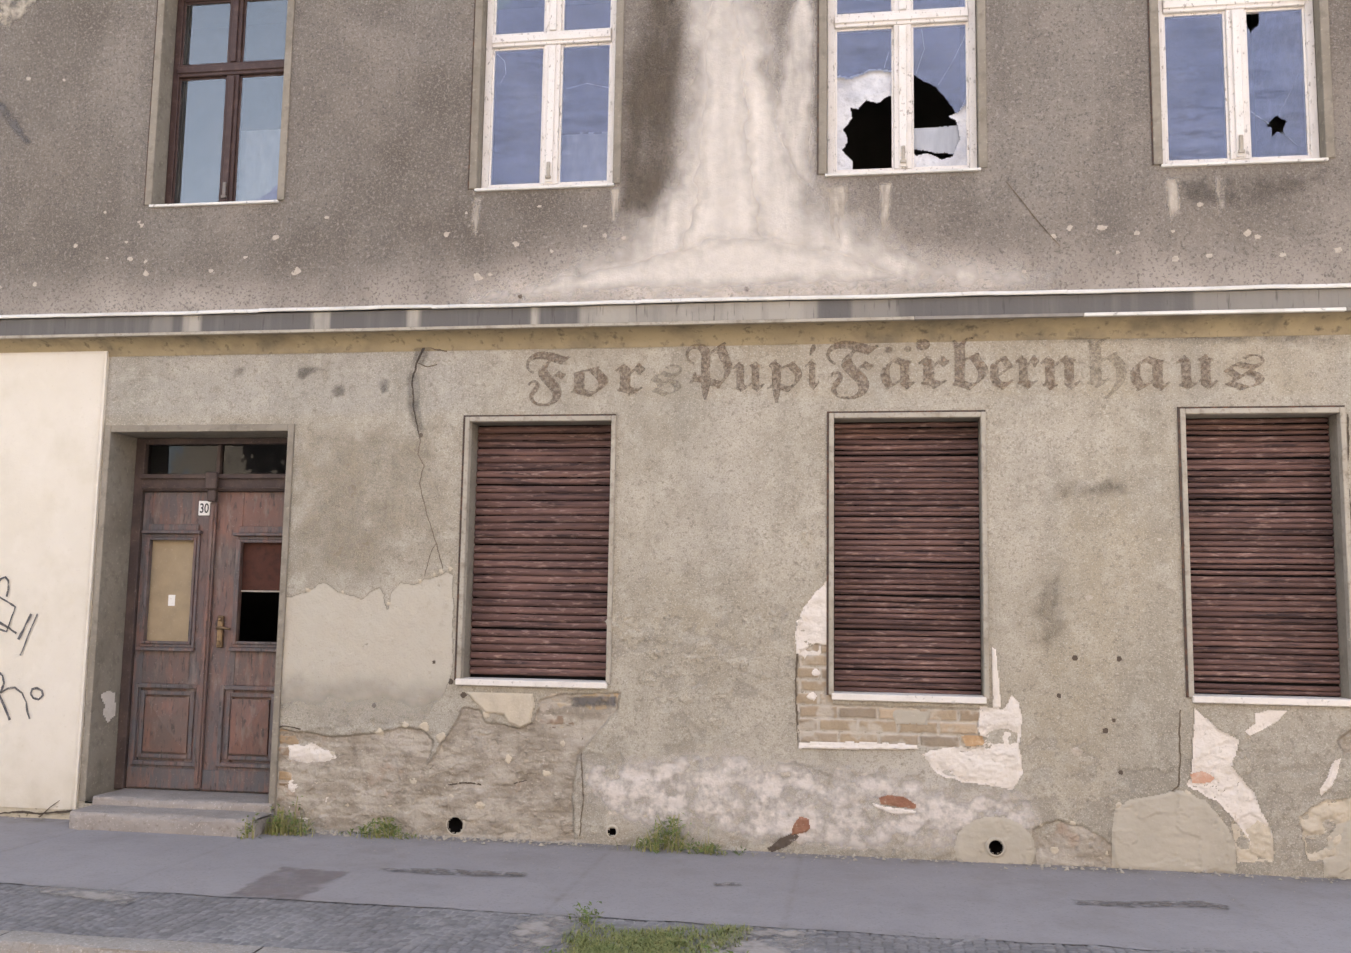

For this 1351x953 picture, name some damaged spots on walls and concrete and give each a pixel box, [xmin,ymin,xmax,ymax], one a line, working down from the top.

leakage [527,0,918,296]
crack [411,348,447,573]
flaking render [275,567,621,843]
flaking render [873,795,916,815]
flaking render [795,581,1023,790]
flaking render [1184,708,1287,863]
flaking render [1299,730,1351,861]